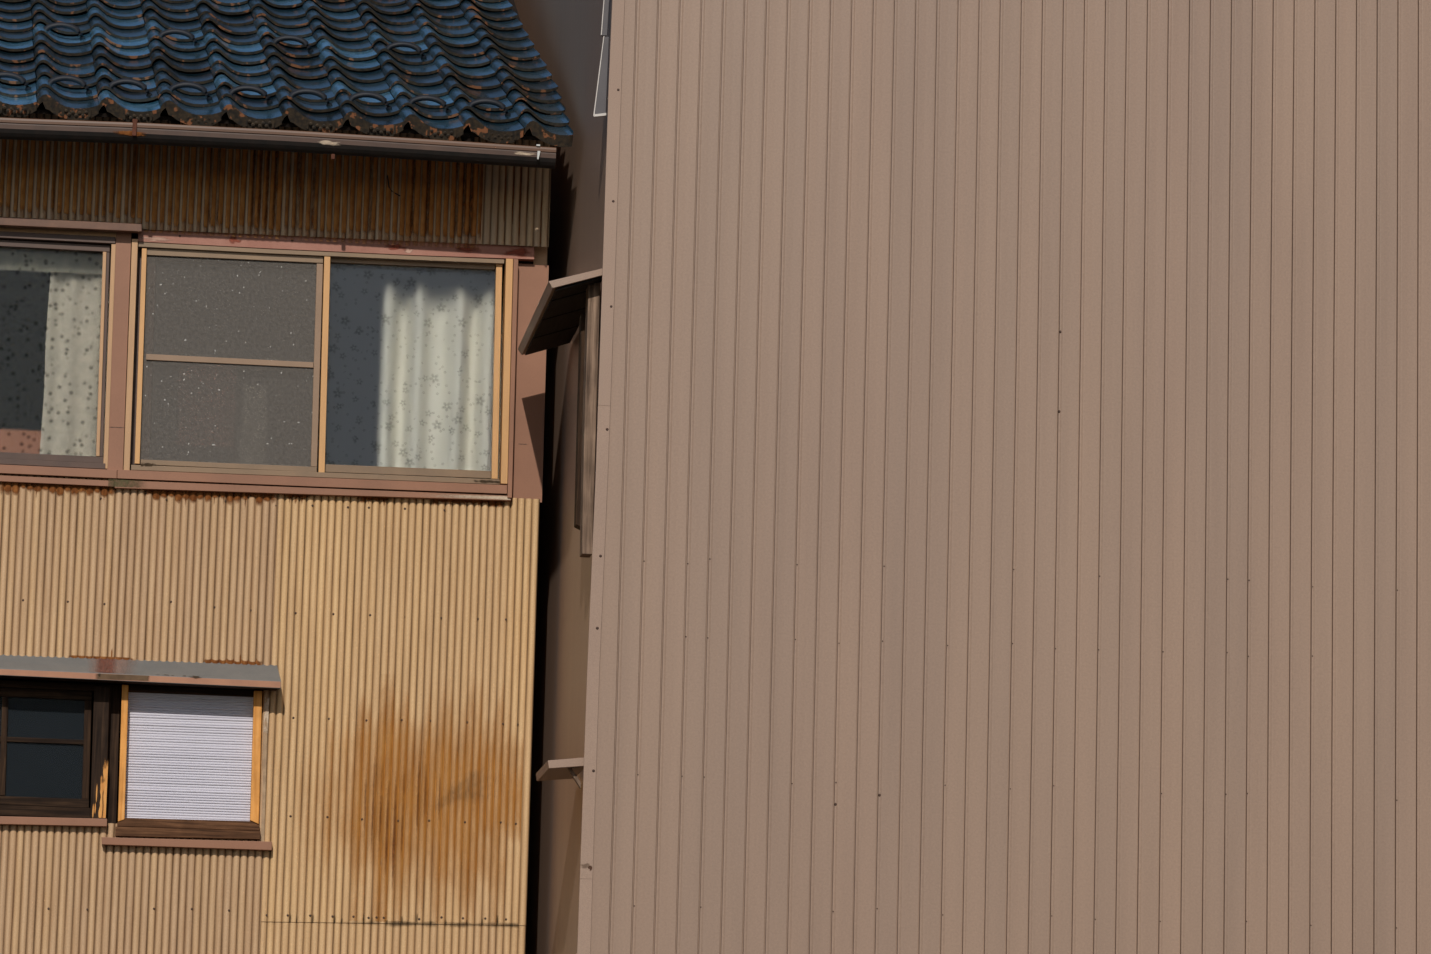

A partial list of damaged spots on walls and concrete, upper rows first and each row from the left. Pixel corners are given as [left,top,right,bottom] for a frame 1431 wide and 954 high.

rust [0,131,483,240]
rust [504,166,543,245]
rust [351,704,523,922]